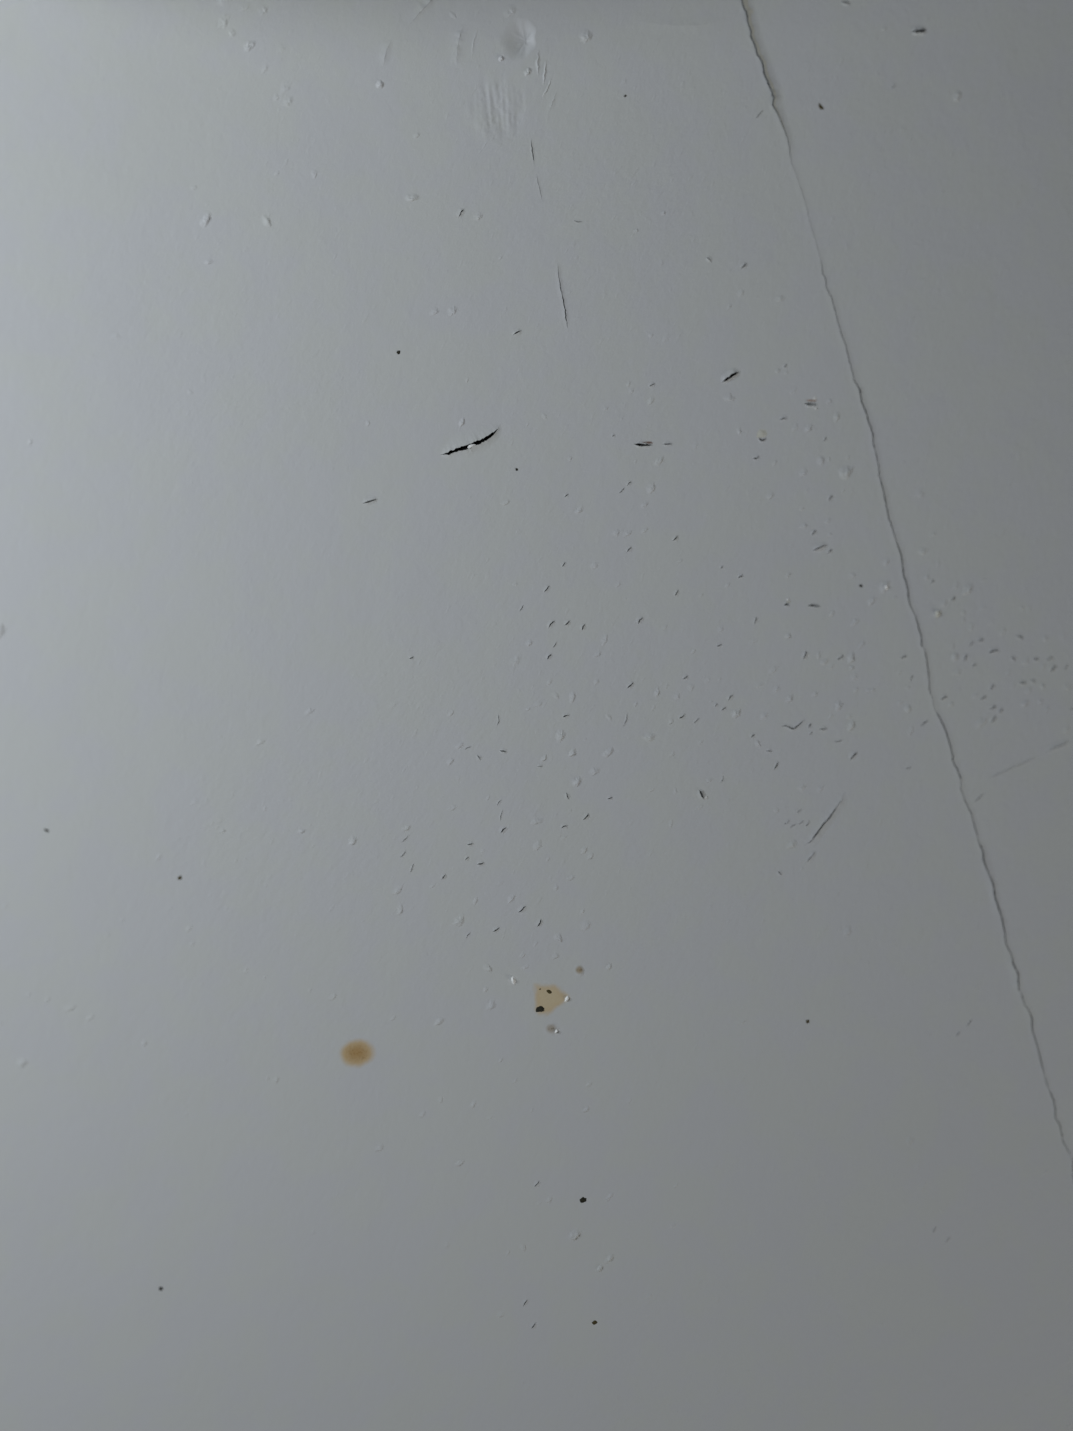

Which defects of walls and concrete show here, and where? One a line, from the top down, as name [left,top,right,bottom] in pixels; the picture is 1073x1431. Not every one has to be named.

corrosion [324,1027,387,1079]
crack [736,0,1073,1192]